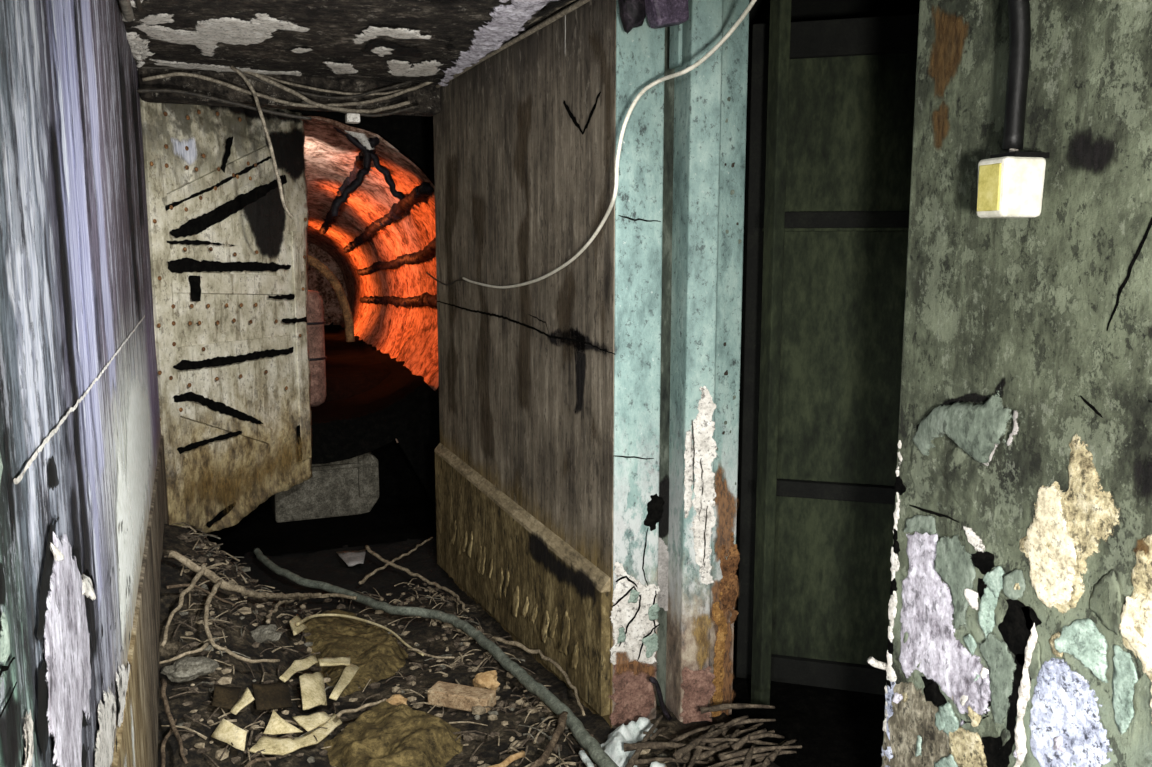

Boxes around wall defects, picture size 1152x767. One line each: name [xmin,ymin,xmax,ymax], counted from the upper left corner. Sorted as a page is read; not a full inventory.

peeling [122,0,309,76]
peeling [322,62,358,74]
peeling [354,0,574,86]
crack [437,301,615,355]
peeling [48,456,59,491]
peeling [684,386,718,585]
peeling [0,562,10,665]
peeling [37,515,130,767]
peeling [610,493,669,665]
rust [693,466,740,717]
peeling [881,433,1152,767]